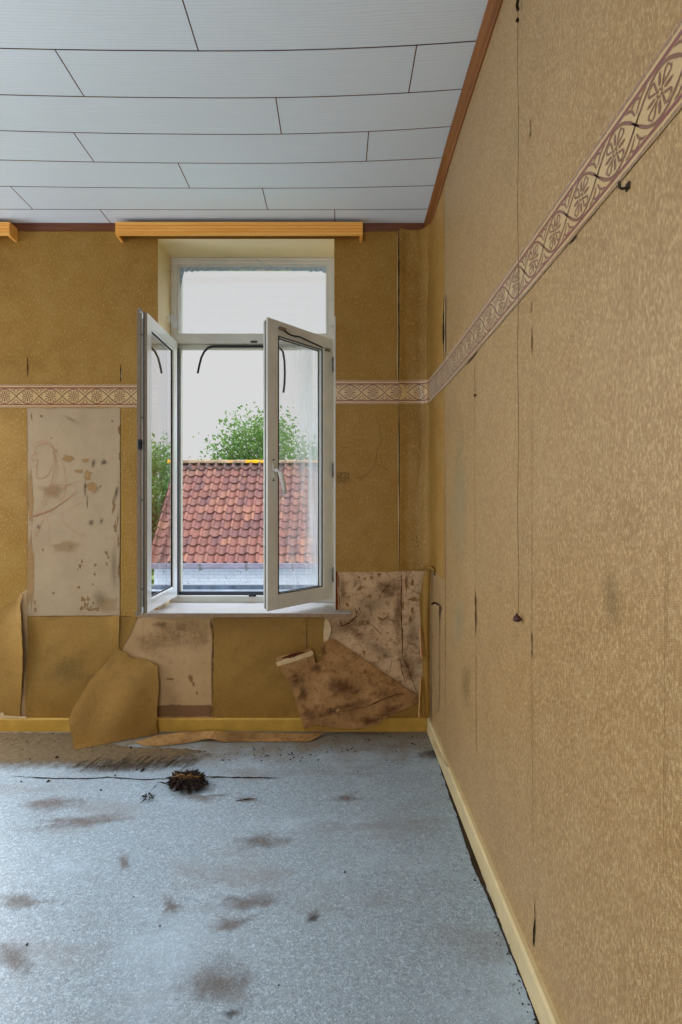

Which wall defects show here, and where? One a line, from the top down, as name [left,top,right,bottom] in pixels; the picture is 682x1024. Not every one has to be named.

flaking render [19,408,120,717]
flaking render [122,617,214,717]
flaking render [327,571,424,695]